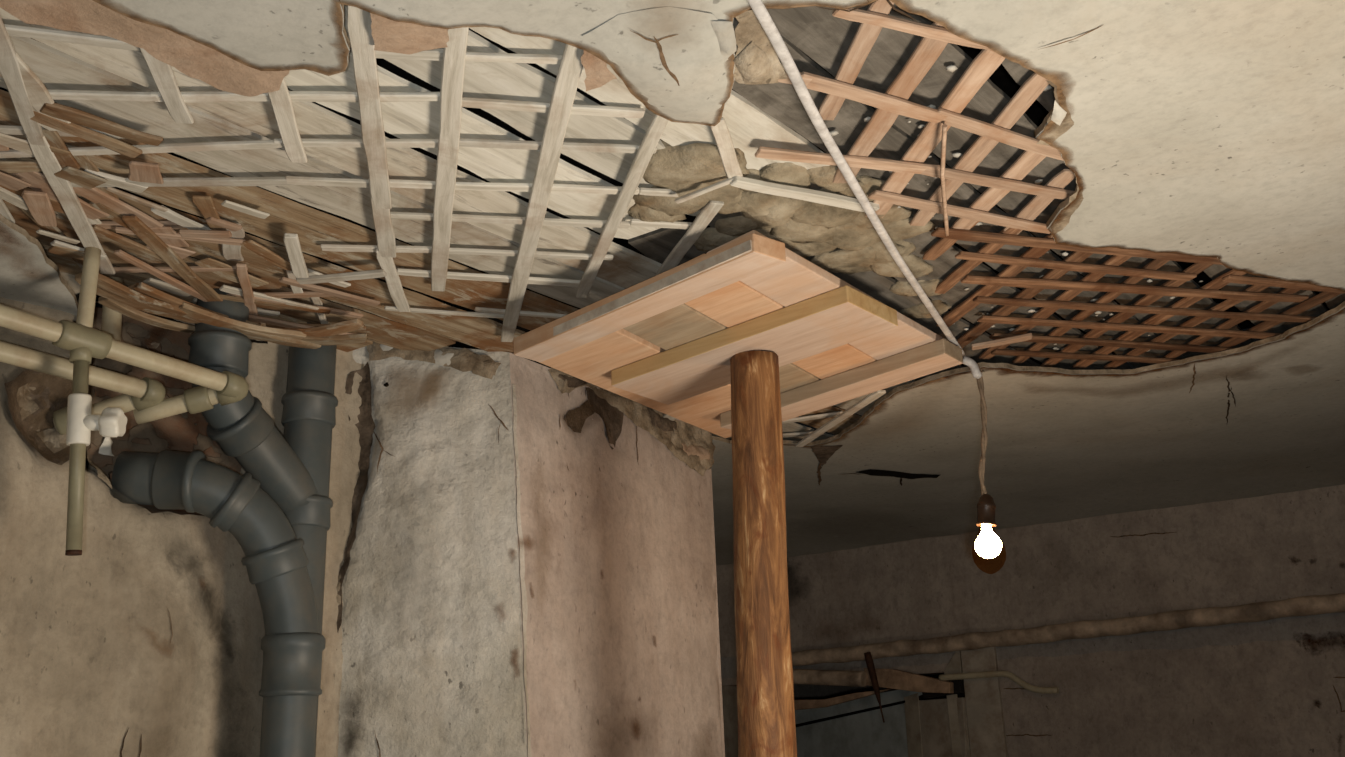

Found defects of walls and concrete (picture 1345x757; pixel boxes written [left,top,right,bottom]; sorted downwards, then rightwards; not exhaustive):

flaking render [0,0,1345,291]
flaking render [92,307,102,331]
flaking render [121,311,191,362]
flaking render [4,369,123,465]
flaking render [89,357,193,399]
flaking render [86,410,242,495]
crack [373,431,393,472]
flaking render [548,368,715,476]
flaking render [783,308,1345,486]
crack [1189,363,1236,423]
flaking render [136,503,204,516]